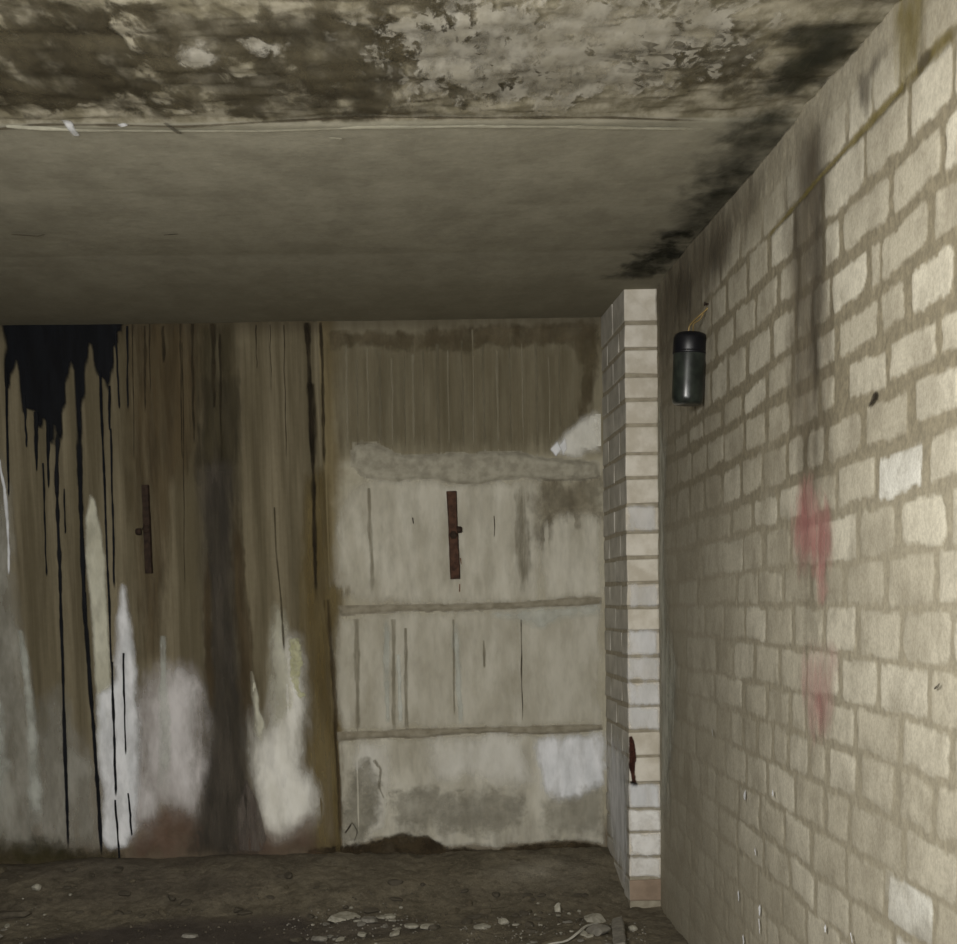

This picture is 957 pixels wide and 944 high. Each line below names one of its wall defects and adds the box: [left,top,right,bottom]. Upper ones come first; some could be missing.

leakage [0,0,858,120]
leakage [629,113,783,277]
leakage [0,323,314,858]